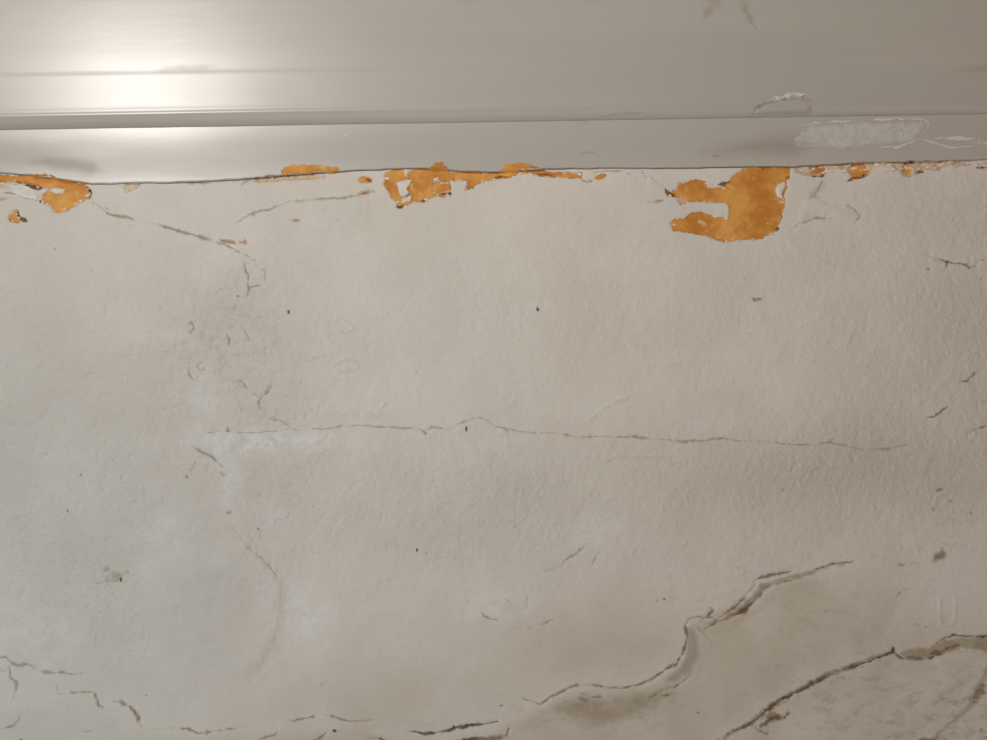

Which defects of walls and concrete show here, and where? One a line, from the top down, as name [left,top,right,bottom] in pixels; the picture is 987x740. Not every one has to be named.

peeling [8,209,27,223]
peeling [0,173,92,213]
peeling [254,164,340,183]
peeling [358,162,583,209]
peeling [665,160,987,243]
crack [625,599,753,698]
crack [848,634,986,669]
crack [734,676,826,731]
crack [411,721,509,740]